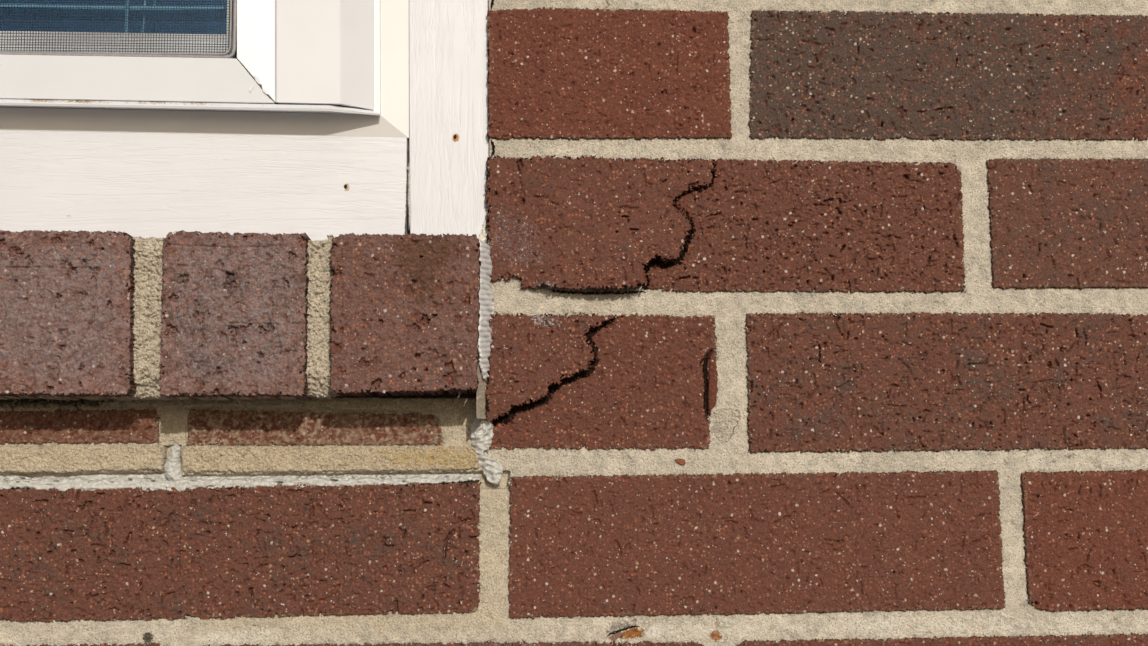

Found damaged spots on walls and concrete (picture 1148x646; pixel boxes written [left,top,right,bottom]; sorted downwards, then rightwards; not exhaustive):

crack [485,139,718,295]
crack [699,352,718,416]